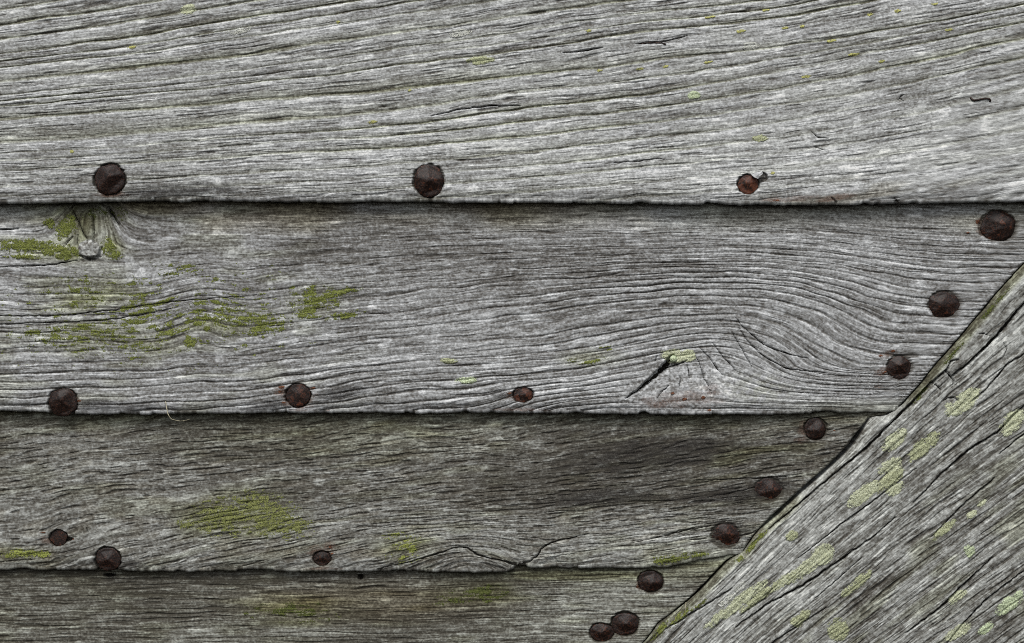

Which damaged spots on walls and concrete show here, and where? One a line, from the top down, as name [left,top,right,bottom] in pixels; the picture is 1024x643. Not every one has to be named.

crack [627,320,826,398]
crack [380,534,586,570]